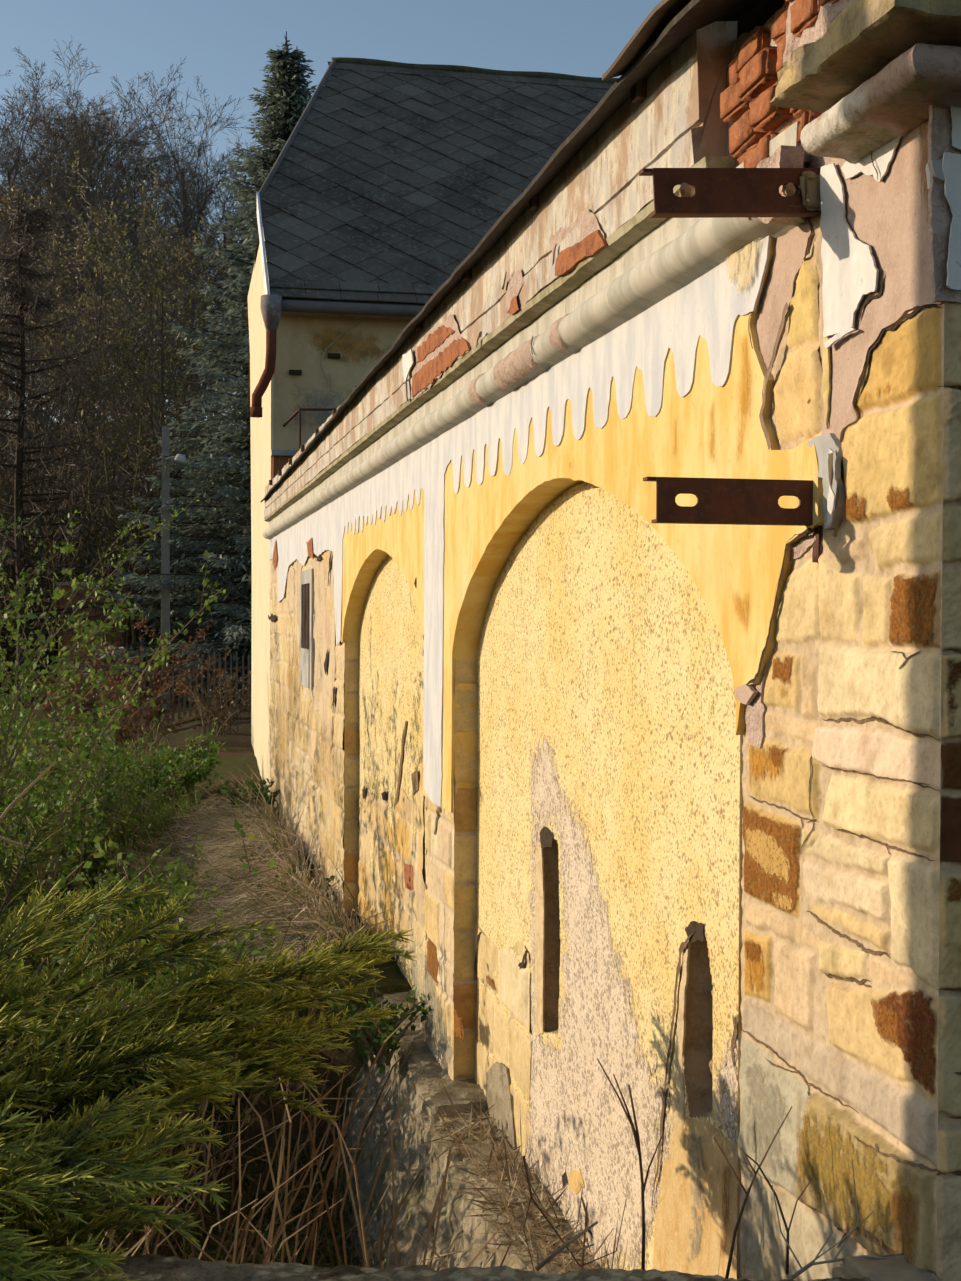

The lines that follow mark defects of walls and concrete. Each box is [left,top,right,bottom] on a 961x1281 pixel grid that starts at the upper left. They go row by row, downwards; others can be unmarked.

flaking render [720,0,839,168]
flaking render [549,208,608,276]
flaking render [402,314,471,401]
flaking render [736,104,961,748]
peeling [524,739,738,1279]